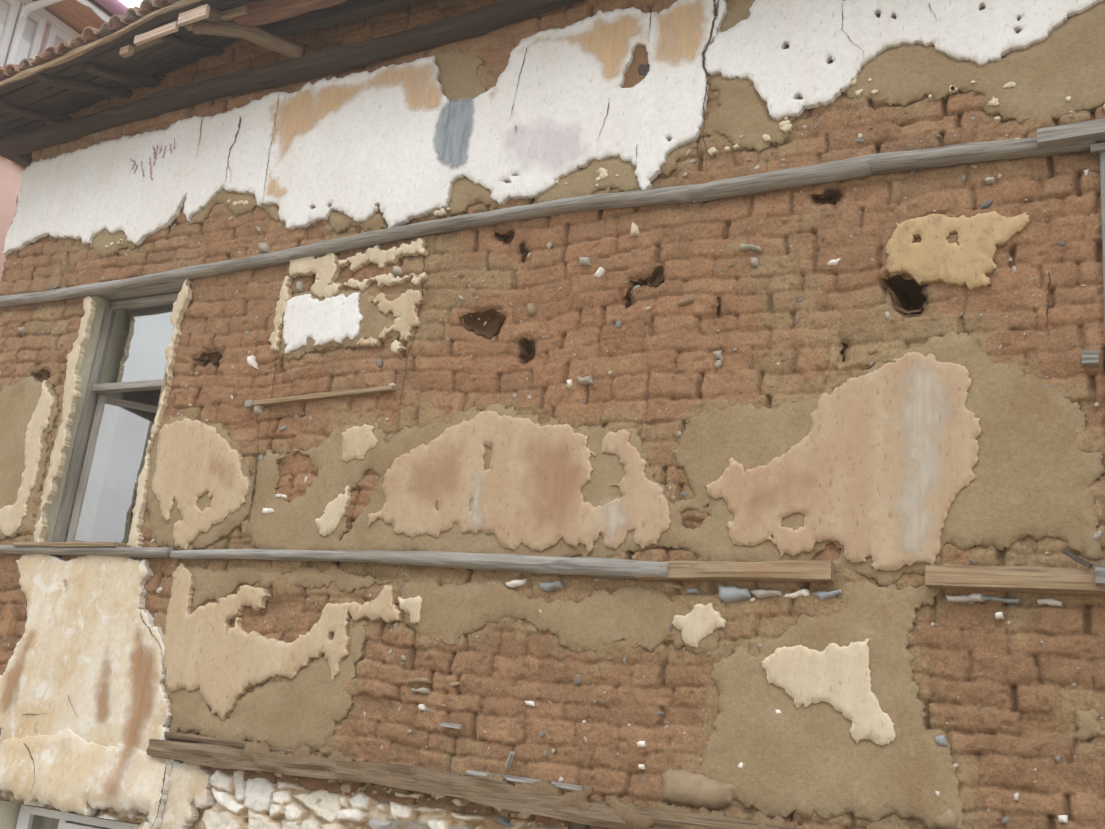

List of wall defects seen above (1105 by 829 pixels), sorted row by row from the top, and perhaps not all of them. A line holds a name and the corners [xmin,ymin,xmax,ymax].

crack [223,117,241,187]
peeling [2,0,1105,255]
crack [702,0,717,175]
peeling [269,238,430,361]
spalling [494,230,528,262]
spalling [624,265,664,308]
peeling [880,211,1030,314]
spalling [0,278,1105,829]